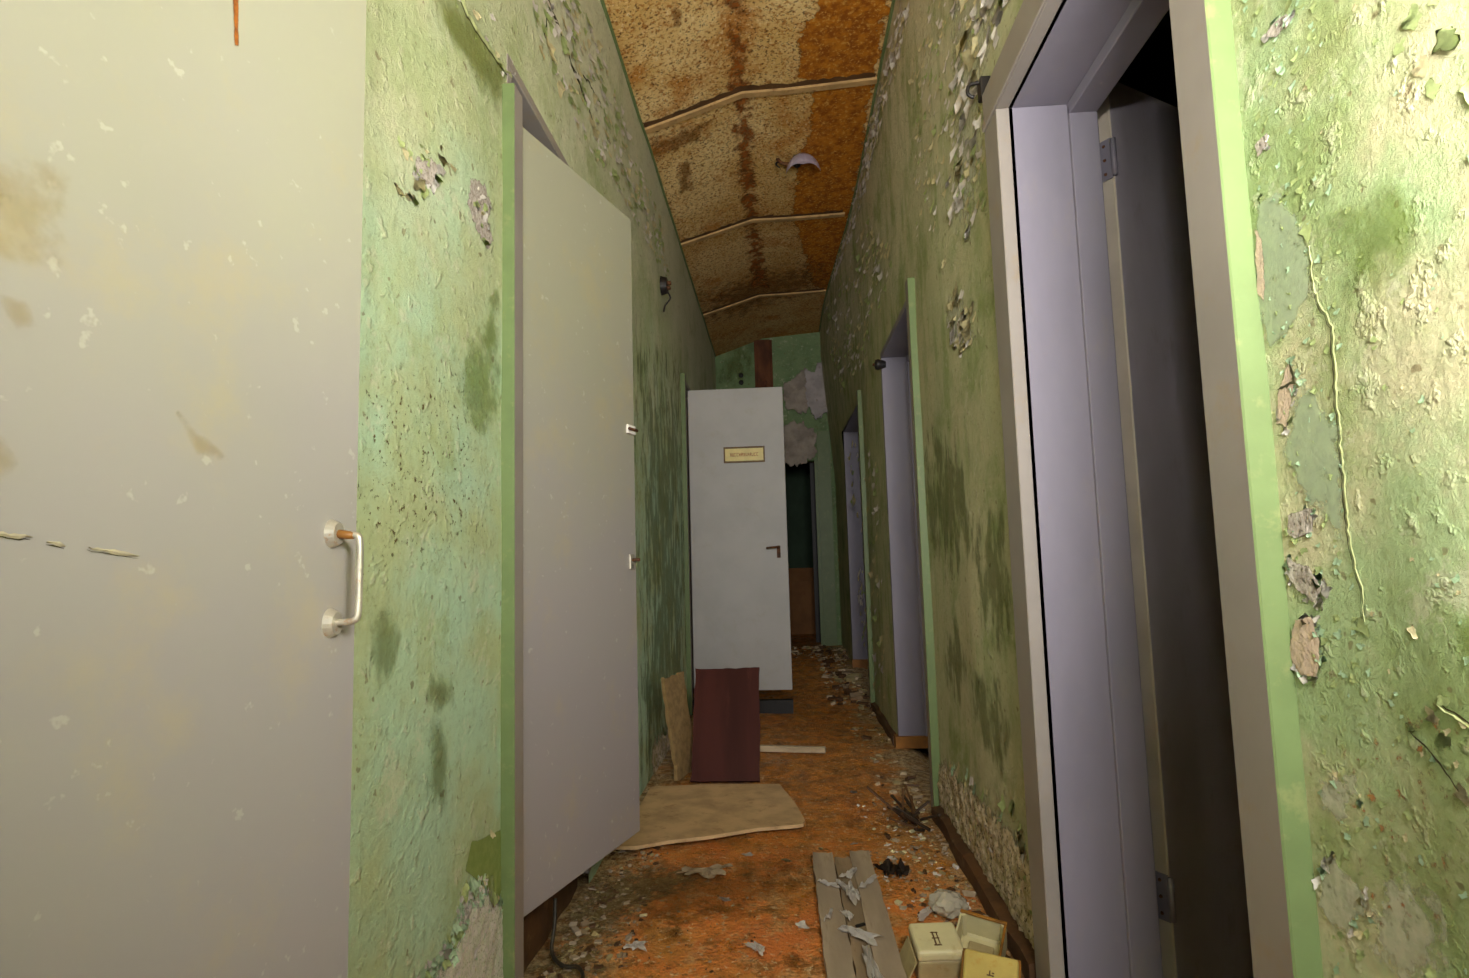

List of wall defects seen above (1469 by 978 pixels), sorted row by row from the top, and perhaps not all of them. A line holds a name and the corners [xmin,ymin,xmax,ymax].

peeling [394,135,494,249]
rust [700,0,890,318]
peeling [945,0,1008,242]
peeling [946,282,976,358]
peeling [783,361,828,467]
crack [1406,694,1469,798]
spalling [414,829,503,978]